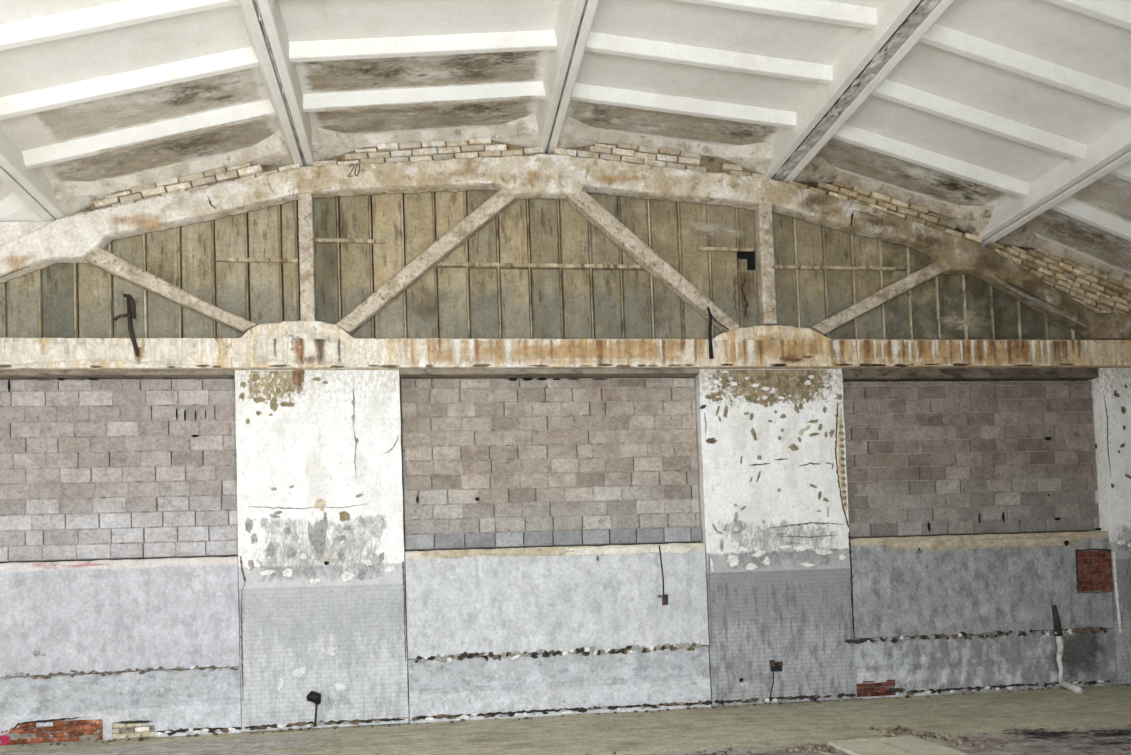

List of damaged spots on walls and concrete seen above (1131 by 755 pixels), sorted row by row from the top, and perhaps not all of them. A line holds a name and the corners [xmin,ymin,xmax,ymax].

damp [309,51,535,91]
damp [42,77,257,140]
damp [59,116,272,181]
damp [318,96,531,133]
damp [574,105,772,145]
damp [818,142,999,206]
corrosion [293,338,314,387]
peeling [239,365,328,424]
peeling [700,363,970,528]
peeling [245,499,396,582]
peeling [710,504,847,572]
spalling [0,665,238,679]